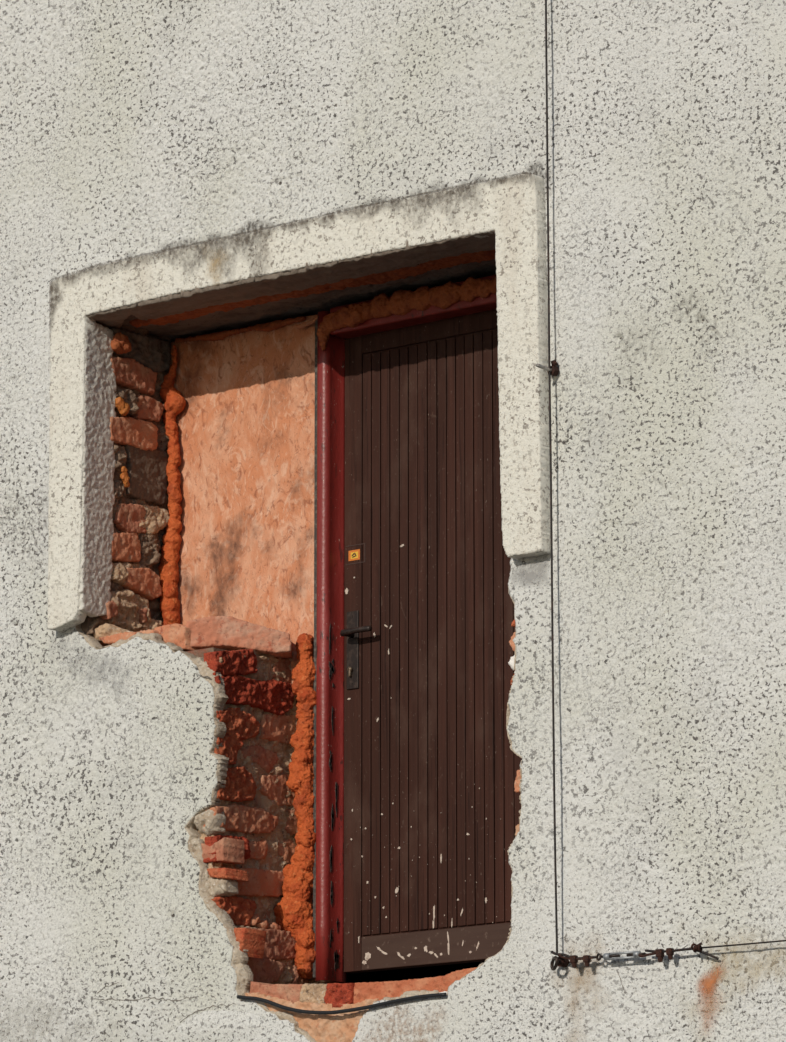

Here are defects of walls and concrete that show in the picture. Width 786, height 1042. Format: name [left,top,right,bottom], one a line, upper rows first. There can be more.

flaking render [76,321,523,1042]
corrosion [701,969,720,994]